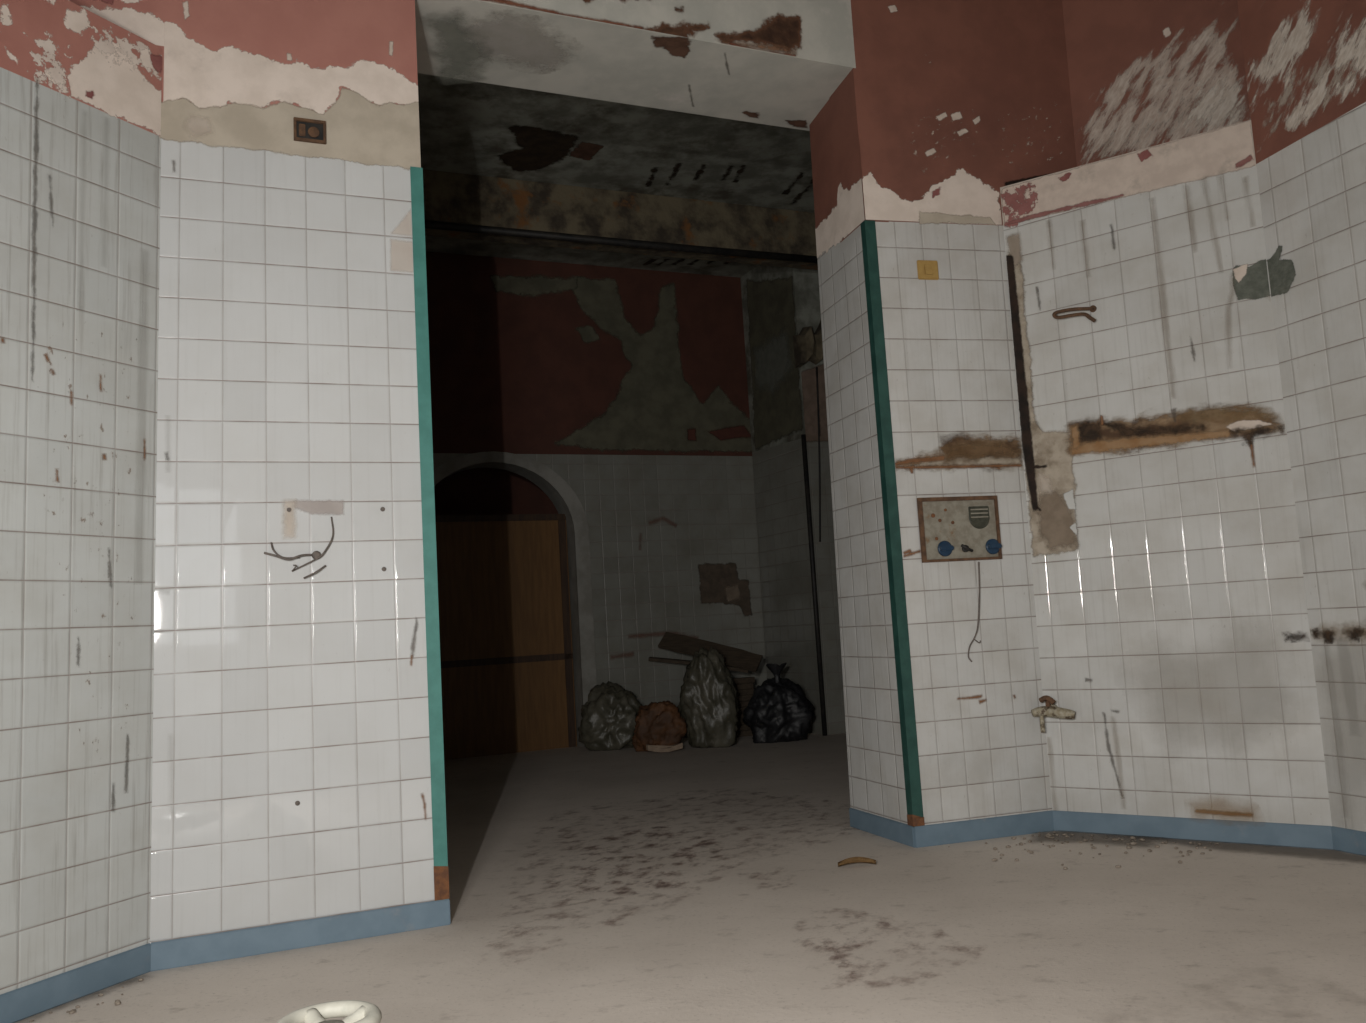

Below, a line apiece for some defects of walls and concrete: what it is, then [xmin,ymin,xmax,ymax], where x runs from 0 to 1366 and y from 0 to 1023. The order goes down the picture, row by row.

peeling [0,0,421,169]
spalling [645,6,802,58]
peeling [815,0,1366,557]
peeling [490,275,752,453]
rust [1285,628,1366,644]